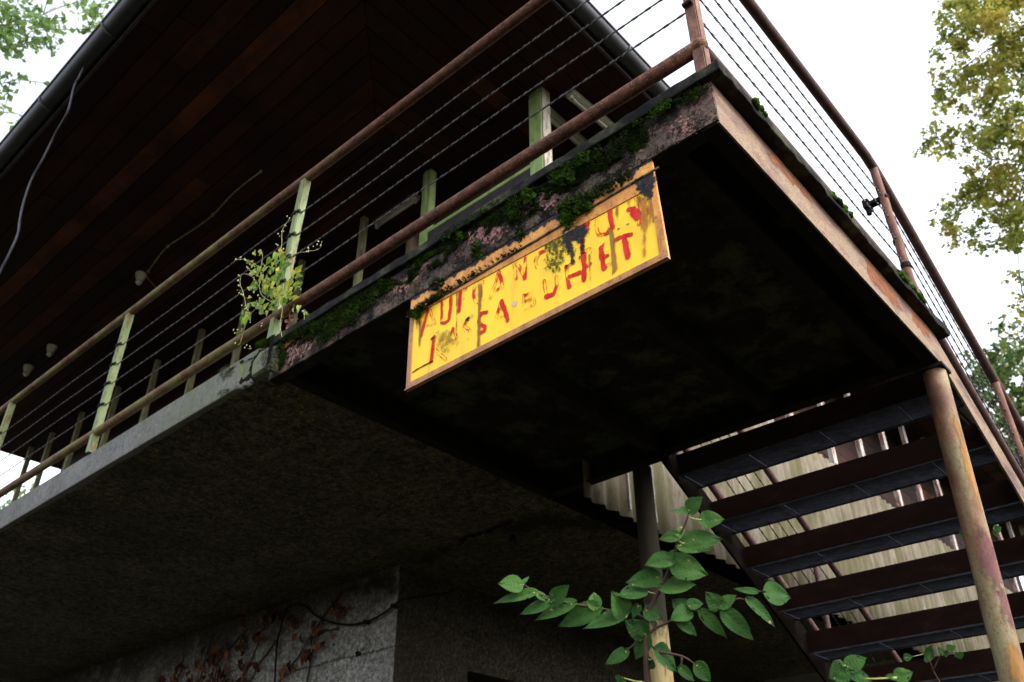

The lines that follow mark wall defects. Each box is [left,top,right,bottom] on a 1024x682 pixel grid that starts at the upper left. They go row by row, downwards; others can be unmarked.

corrosion [768,152,813,202]
leakage [410,159,658,300]
corrosion [608,228,617,274]
corrosion [615,196,654,256]
corrosion [864,256,930,337]
corrosion [954,416,980,503]
corrosion [976,530,1015,628]
corrosion [1007,644,1024,682]